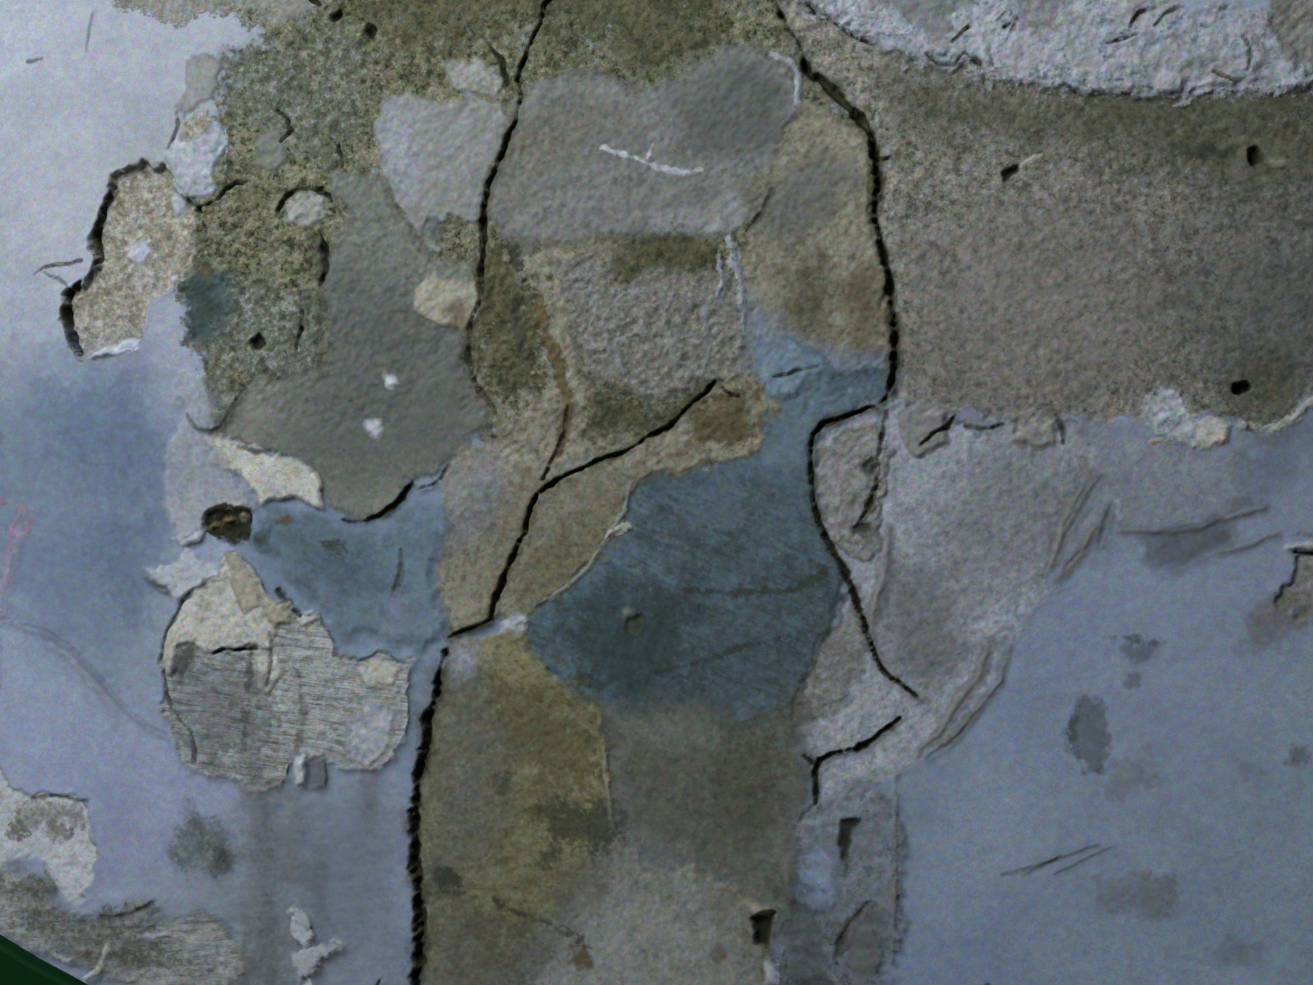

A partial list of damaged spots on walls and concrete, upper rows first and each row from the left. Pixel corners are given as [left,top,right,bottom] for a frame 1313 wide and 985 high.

crack [468,0,553,413]
flaking render [60,0,1313,732]
crack [778,6,917,806]
flaking render [0,768,248,985]
flaking render [145,549,413,791]
peeling [287,907,346,985]
crack [376,380,740,985]
peeling [744,902,775,915]
flaking render [763,404,1244,985]